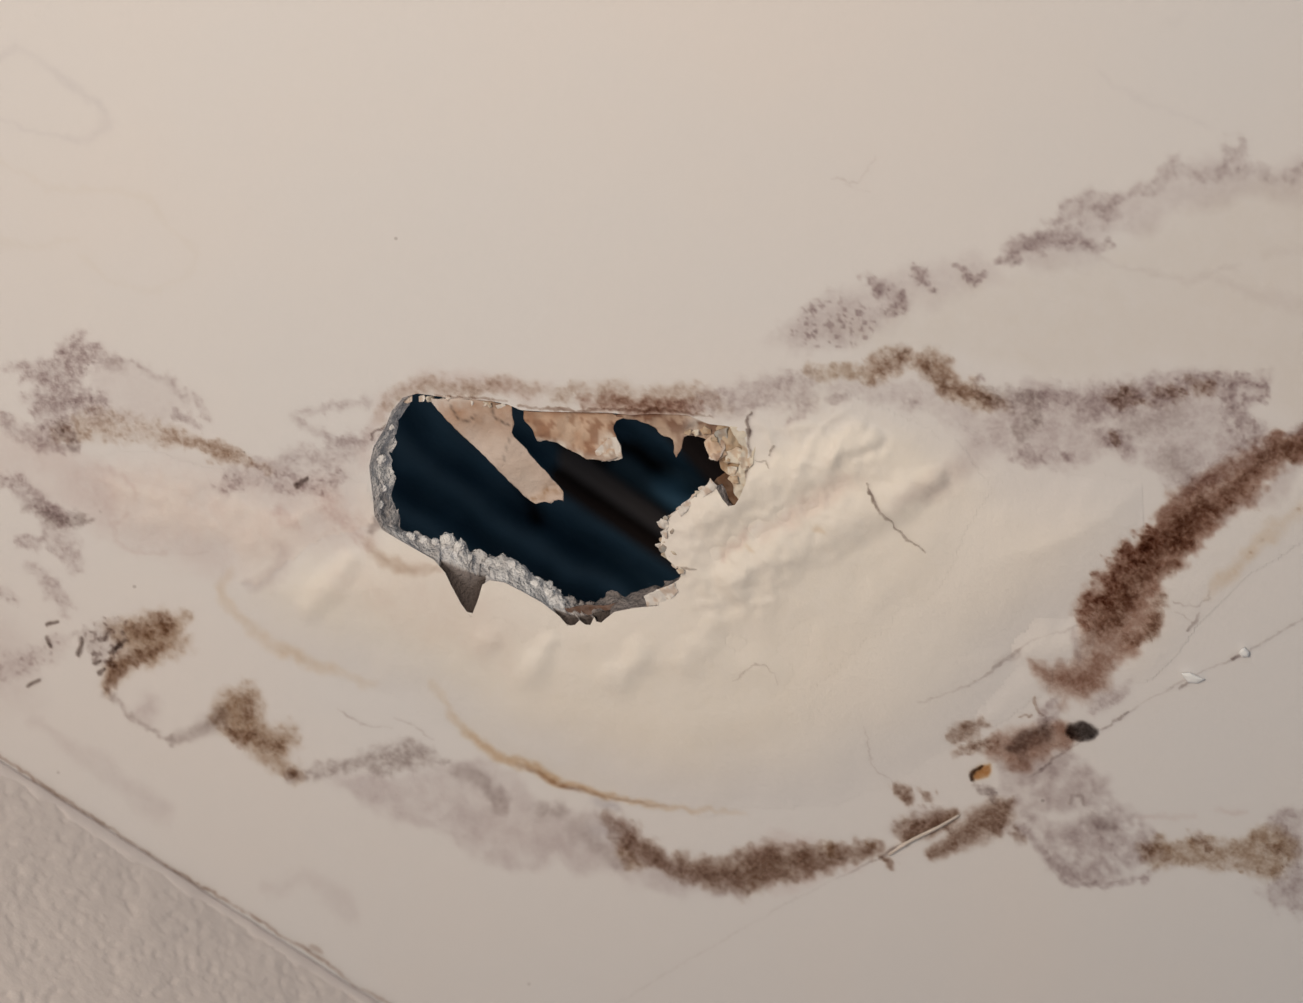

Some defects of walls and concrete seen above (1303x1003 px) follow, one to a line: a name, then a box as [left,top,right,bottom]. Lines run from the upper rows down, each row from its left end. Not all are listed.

spalling [369,395,755,625]
damp [1084,432,1303,650]
damp [1057,721,1098,741]
damp [903,803,1010,857]
damp [621,833,891,889]